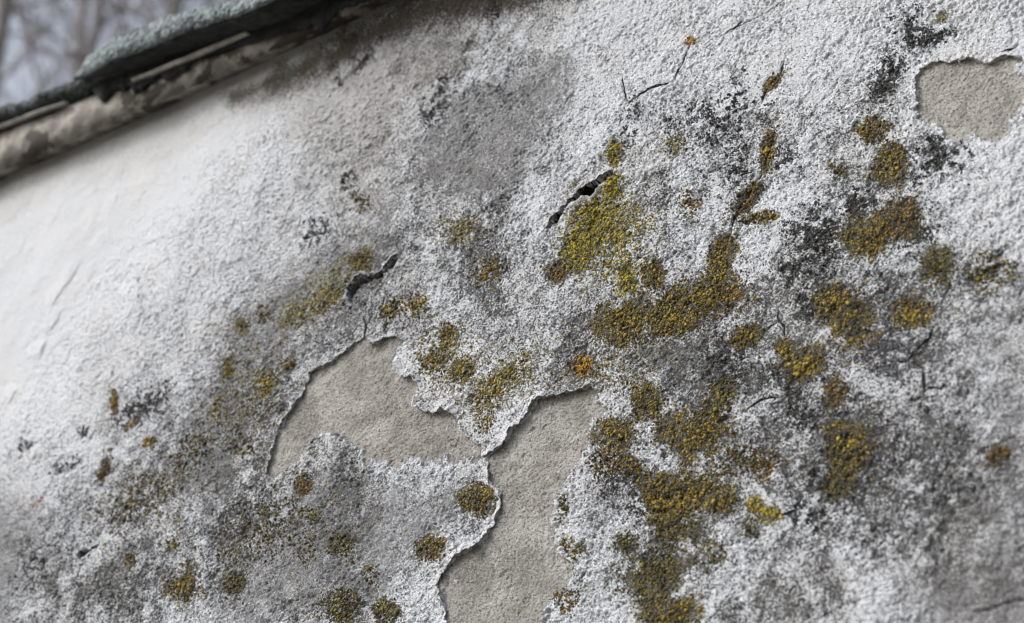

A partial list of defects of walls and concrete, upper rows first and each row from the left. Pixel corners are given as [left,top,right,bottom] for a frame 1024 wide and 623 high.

spalling [910,51,1024,142]
crack [544,165,614,229]
crack [342,251,399,335]
spalling [262,328,608,623]